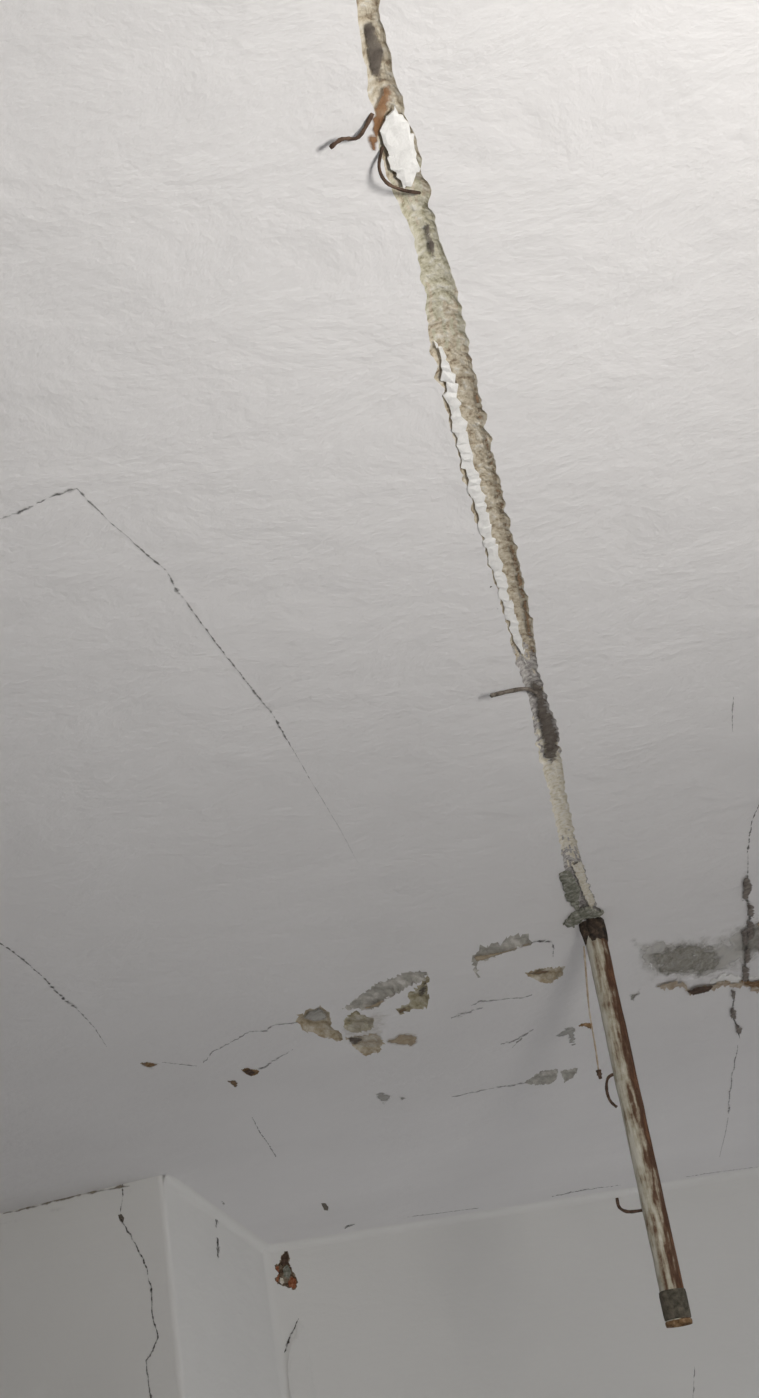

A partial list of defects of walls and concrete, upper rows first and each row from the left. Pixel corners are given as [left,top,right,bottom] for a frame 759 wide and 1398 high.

flaking render [380,104,420,189]
flaking render [434,341,528,667]
crack [17,488,349,846]
crack [0,943,107,1047]
flaking render [296,970,430,1057]
flaking render [452,933,565,1018]
flaking render [500,1068,578,1087]
flaking render [557,1028,575,1045]
flaking render [657,973,759,996]
crack [688,806,759,1177]
crack [120,1184,159,1398]